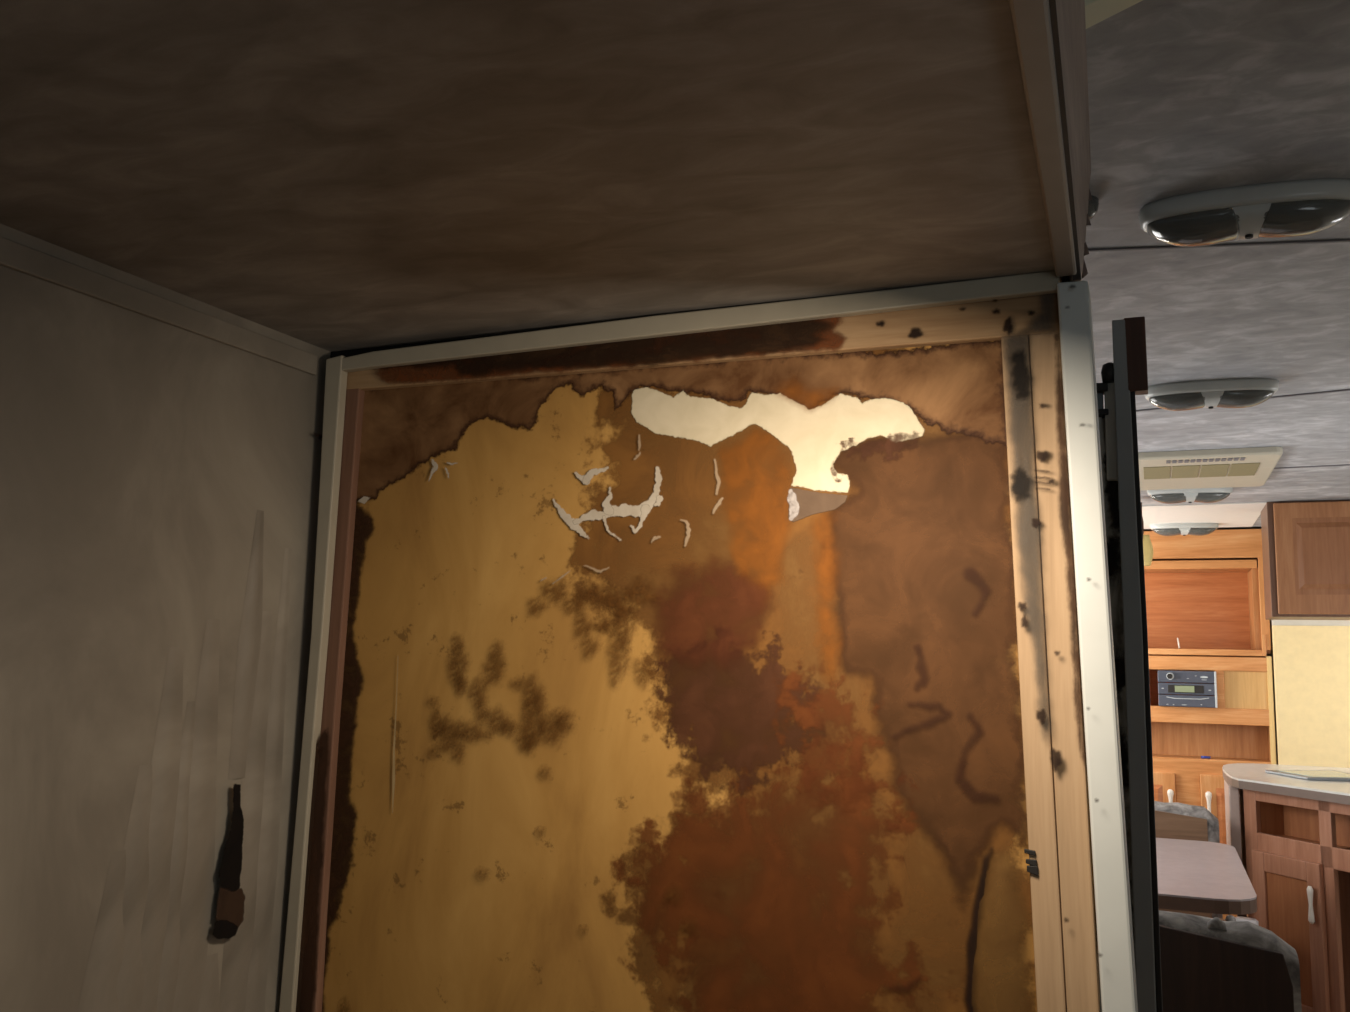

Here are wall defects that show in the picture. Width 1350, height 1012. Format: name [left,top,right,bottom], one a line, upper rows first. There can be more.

damp [296,293,1085,1012]
peeling [631,387,924,522]
damp [1103,455,1133,890]